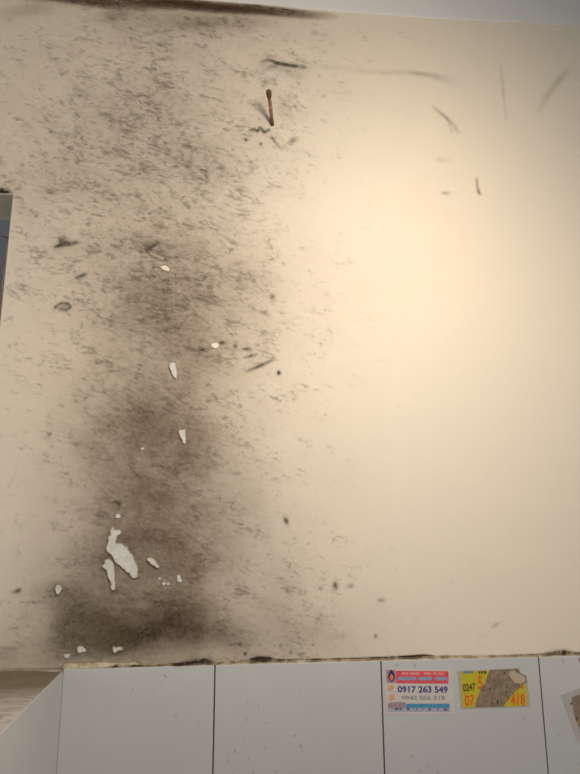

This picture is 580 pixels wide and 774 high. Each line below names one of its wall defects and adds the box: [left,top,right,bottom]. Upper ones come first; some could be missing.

damp [63,0,310,16]
peeling [169,361,178,379]
peeling [102,513,139,590]
peeling [147,557,182,585]
damp [80,568,207,652]